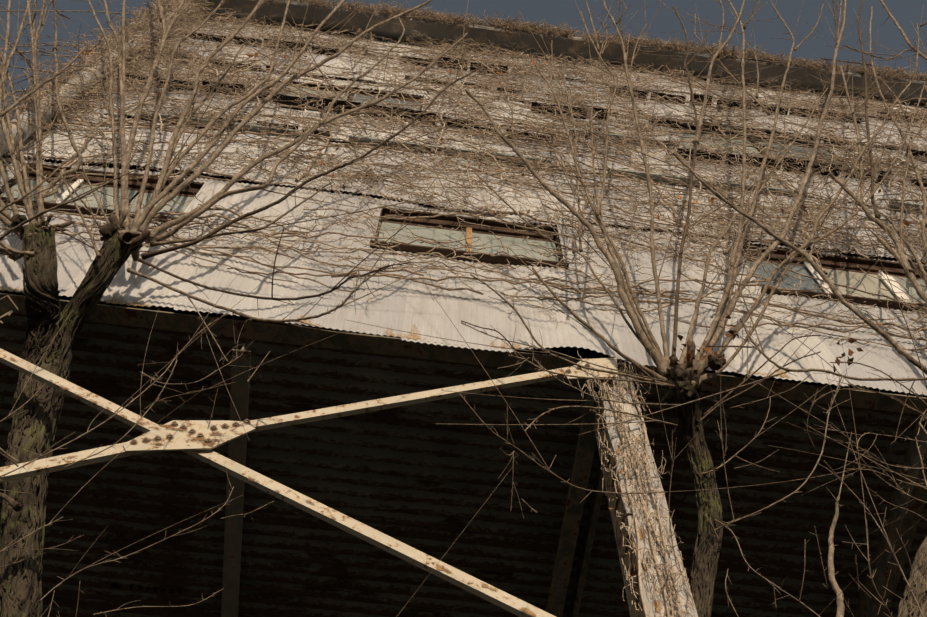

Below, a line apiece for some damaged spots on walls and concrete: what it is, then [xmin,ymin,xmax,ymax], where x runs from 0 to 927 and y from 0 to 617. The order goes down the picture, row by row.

rust [50,365,242,446]
rust [277,396,346,413]
rust [365,406,473,459]
rust [704,434,792,506]